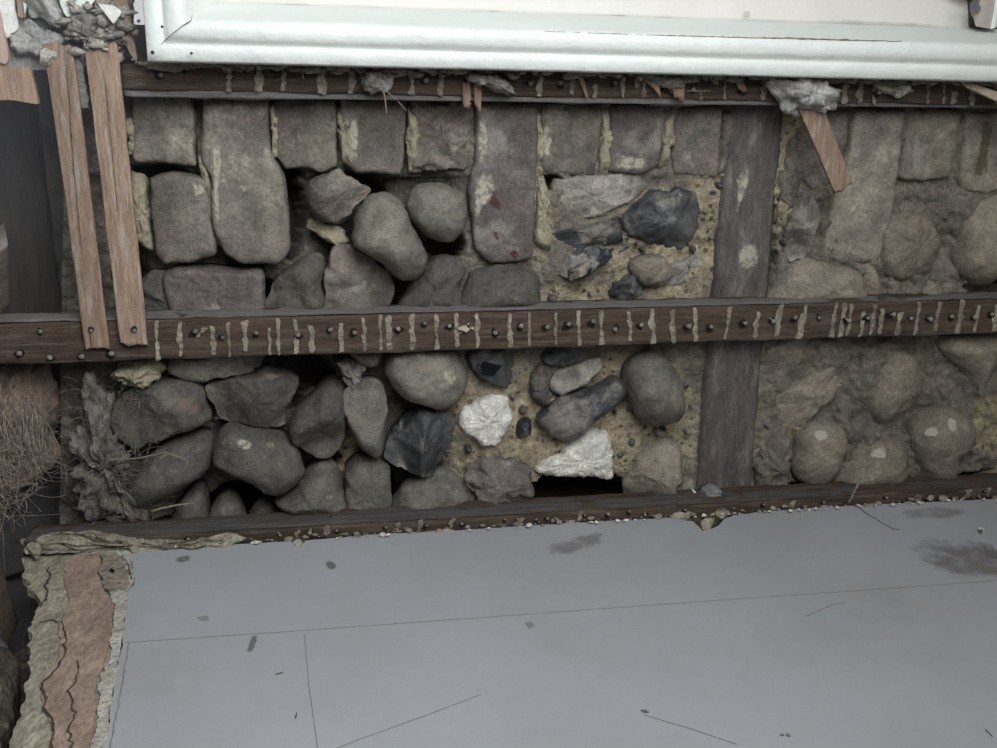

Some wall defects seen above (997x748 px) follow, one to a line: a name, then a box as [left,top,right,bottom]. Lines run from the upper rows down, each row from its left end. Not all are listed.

crack [39,567,80,748]
crack [109,580,997,748]